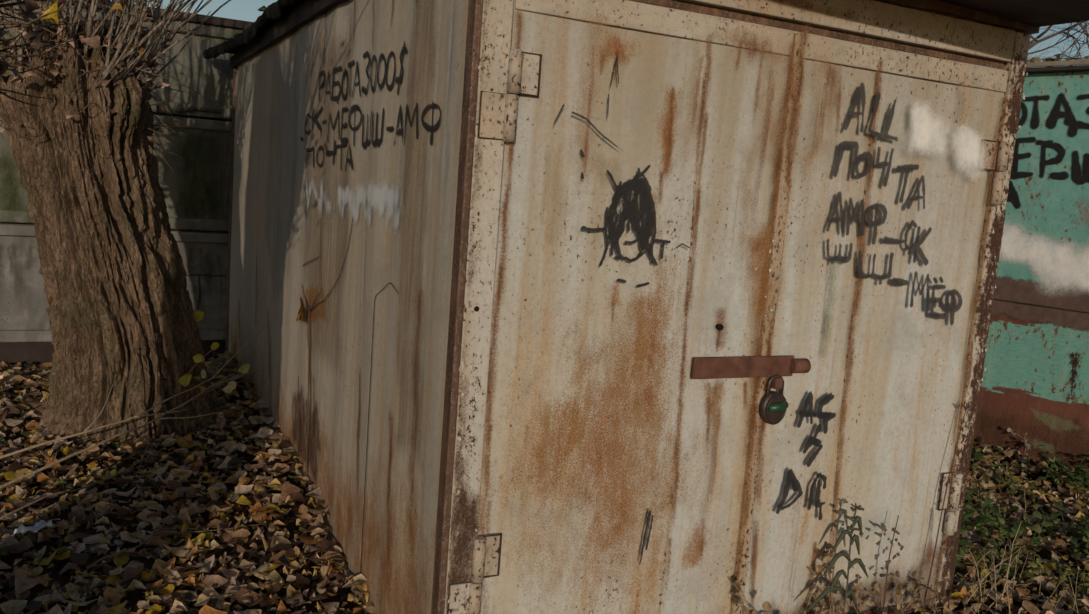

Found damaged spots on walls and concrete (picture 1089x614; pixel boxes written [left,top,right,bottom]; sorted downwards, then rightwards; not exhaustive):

corrosion [231,293,430,614]
corrosion [517,259,695,552]
corrosion [660,89,677,196]
corrosion [684,520,706,569]
corrosion [694,42,711,166]
corrosion [735,377,769,605]
corrosion [755,29,807,356]
corrosion [835,63,882,511]
corrosion [957,287,978,445]
peeling [937,210,1089,614]
corrosion [973,410,1089,471]
corrosion [991,277,1089,331]